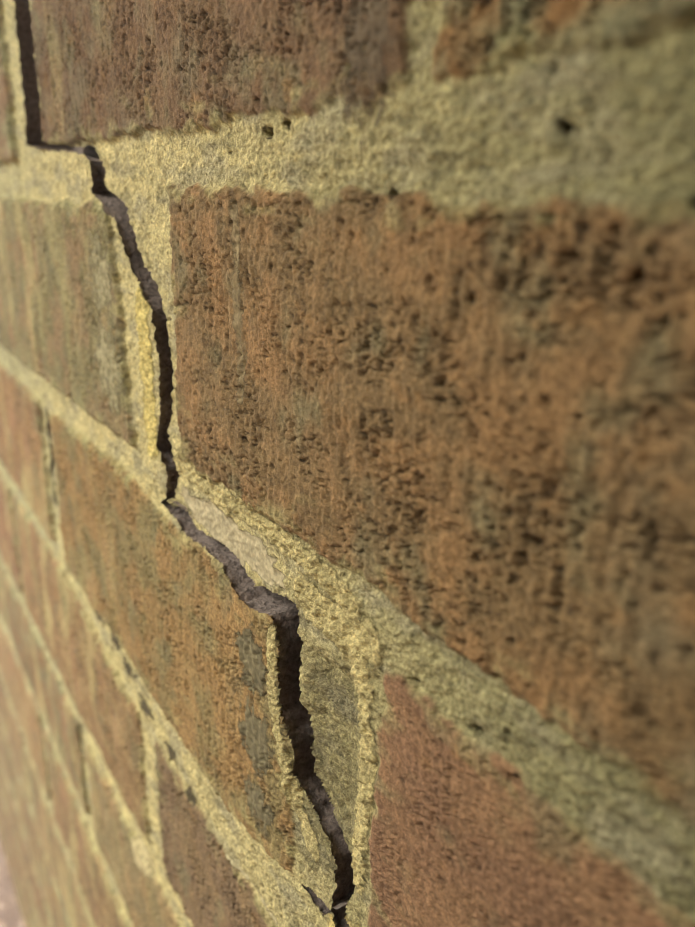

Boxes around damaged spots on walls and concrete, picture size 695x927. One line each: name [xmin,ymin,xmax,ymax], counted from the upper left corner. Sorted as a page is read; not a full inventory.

crack [13,0,356,927]